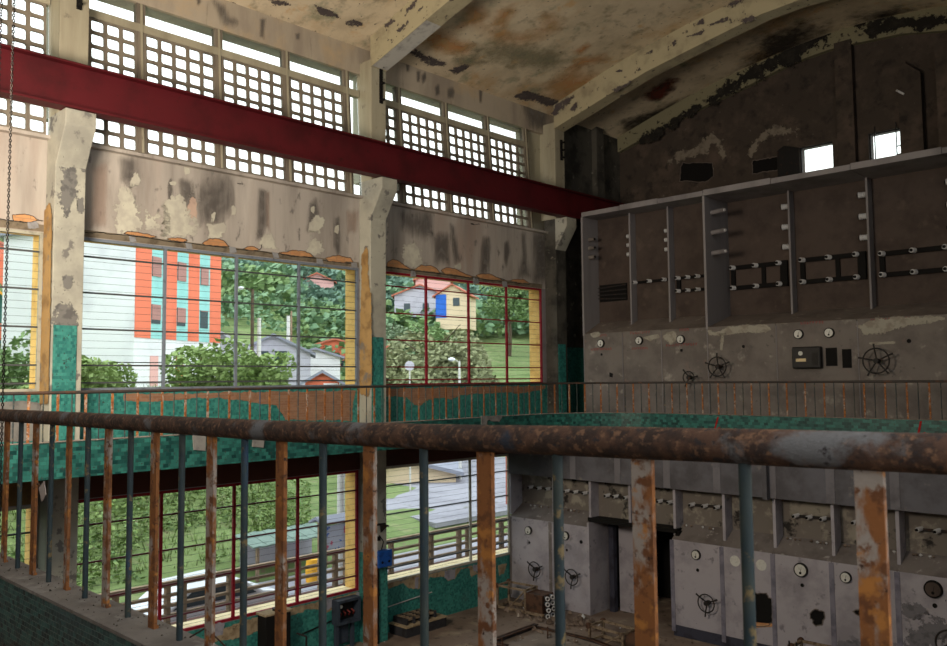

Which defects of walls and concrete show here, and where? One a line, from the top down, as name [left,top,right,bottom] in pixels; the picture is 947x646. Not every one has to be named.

peeling [672,0,756,46]
peeling [854,14,947,39]
peeling [634,33,831,145]
water stain [524,106,545,128]
water stain [123,160,134,182]
water stain [168,181,229,219]
flaking render [0,166,86,411]
spalling [755,592,773,628]
spalling [809,609,825,627]